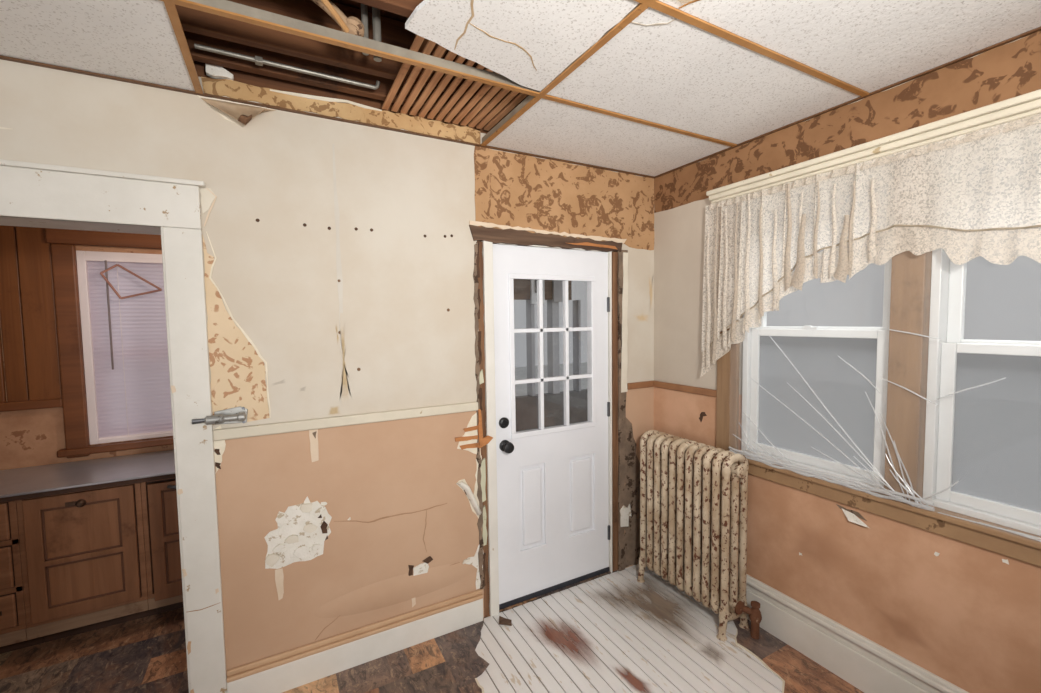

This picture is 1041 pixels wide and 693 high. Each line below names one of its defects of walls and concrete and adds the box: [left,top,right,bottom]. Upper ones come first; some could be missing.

water stain [631,0,699,26]
peeling [197,95,275,127]
flaking render [455,242,493,590]
flaking render [264,496,332,600]
spalling [408,556,433,576]